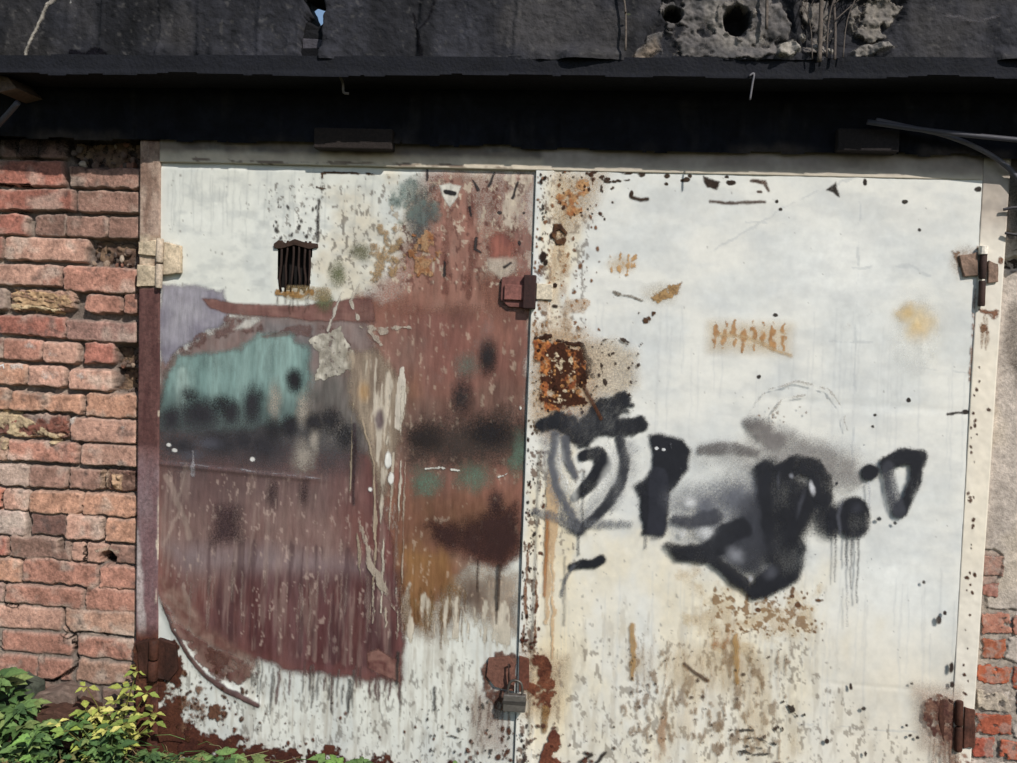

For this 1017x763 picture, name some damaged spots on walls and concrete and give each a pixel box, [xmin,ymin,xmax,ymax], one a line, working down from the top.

spalling [634,0,833,60]
spalling [847,0,903,57]
rust [527,171,605,442]
rust [610,253,637,276]
rust [132,638,394,763]
peeling [367,649,400,683]
rust [479,526,571,763]
rust [615,587,823,763]
rust [920,664,969,763]
flaking render [971,549,1017,763]